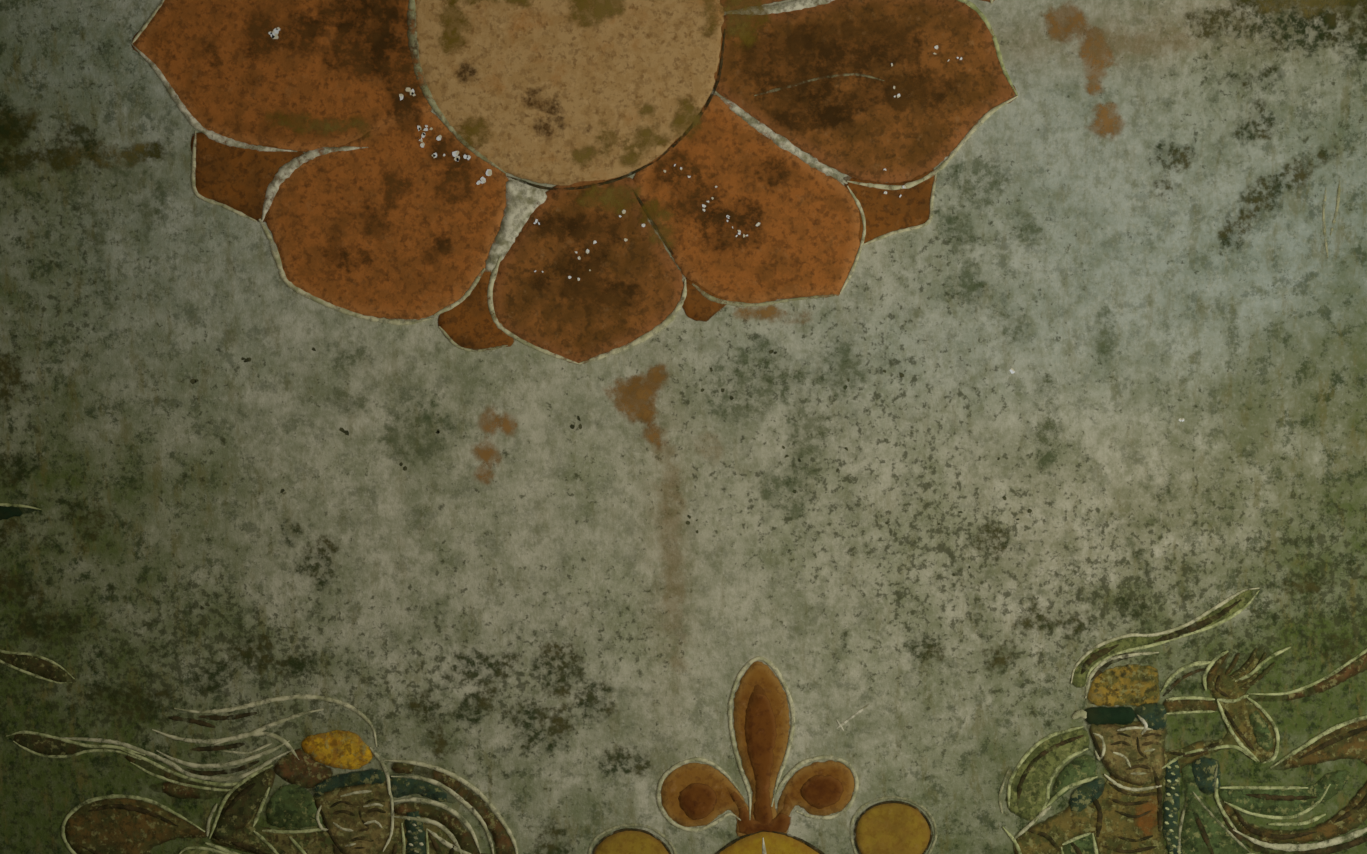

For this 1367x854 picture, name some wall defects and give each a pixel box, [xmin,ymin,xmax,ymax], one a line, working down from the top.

leakage [1187,0,1367,62]
leakage [1229,68,1277,140]
leakage [1155,144,1191,195]
leakage [1218,150,1328,249]
leakage [410,648,518,758]
leakage [509,643,612,751]
leakage [600,746,651,775]